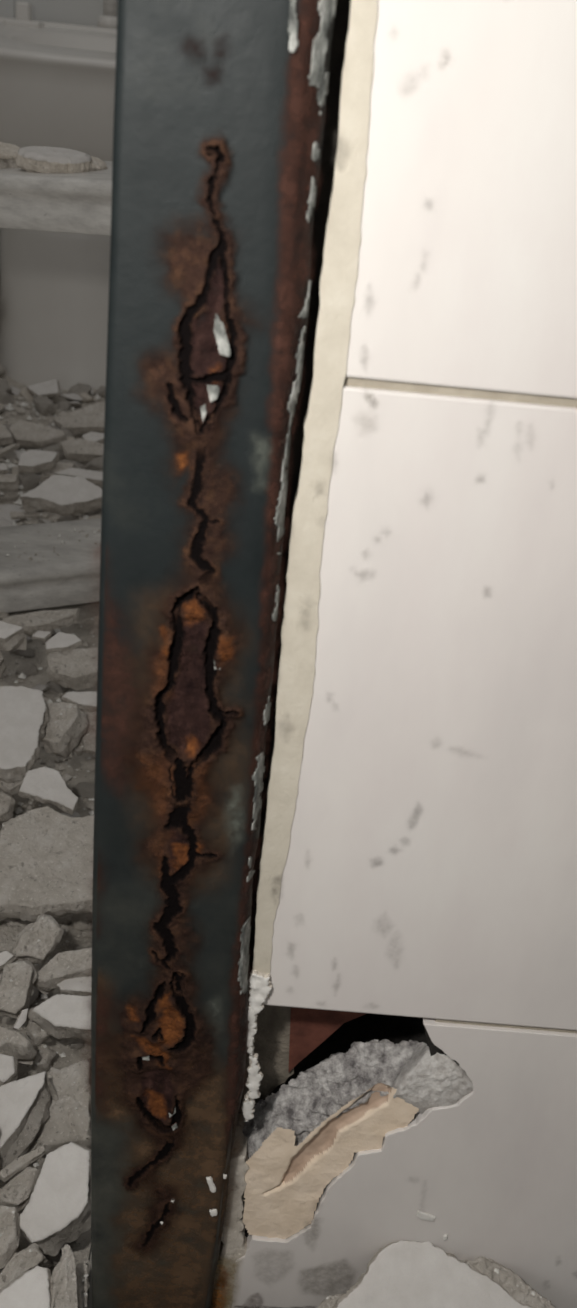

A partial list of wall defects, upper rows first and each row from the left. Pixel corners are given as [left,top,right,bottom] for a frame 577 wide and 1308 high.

peeling [288,0,337,115]
peeling [306,177,317,223]
peeling [312,141,320,161]
peeling [274,280,311,555]
crack [162,410,237,619]
rust [90,0,321,1308]
peeling [263,696,271,726]
peeling [272,585,280,621]
peeling [251,752,265,831]
crack [133,754,223,996]
spalling [238,916,473,1239]
crack [123,1128,180,1254]